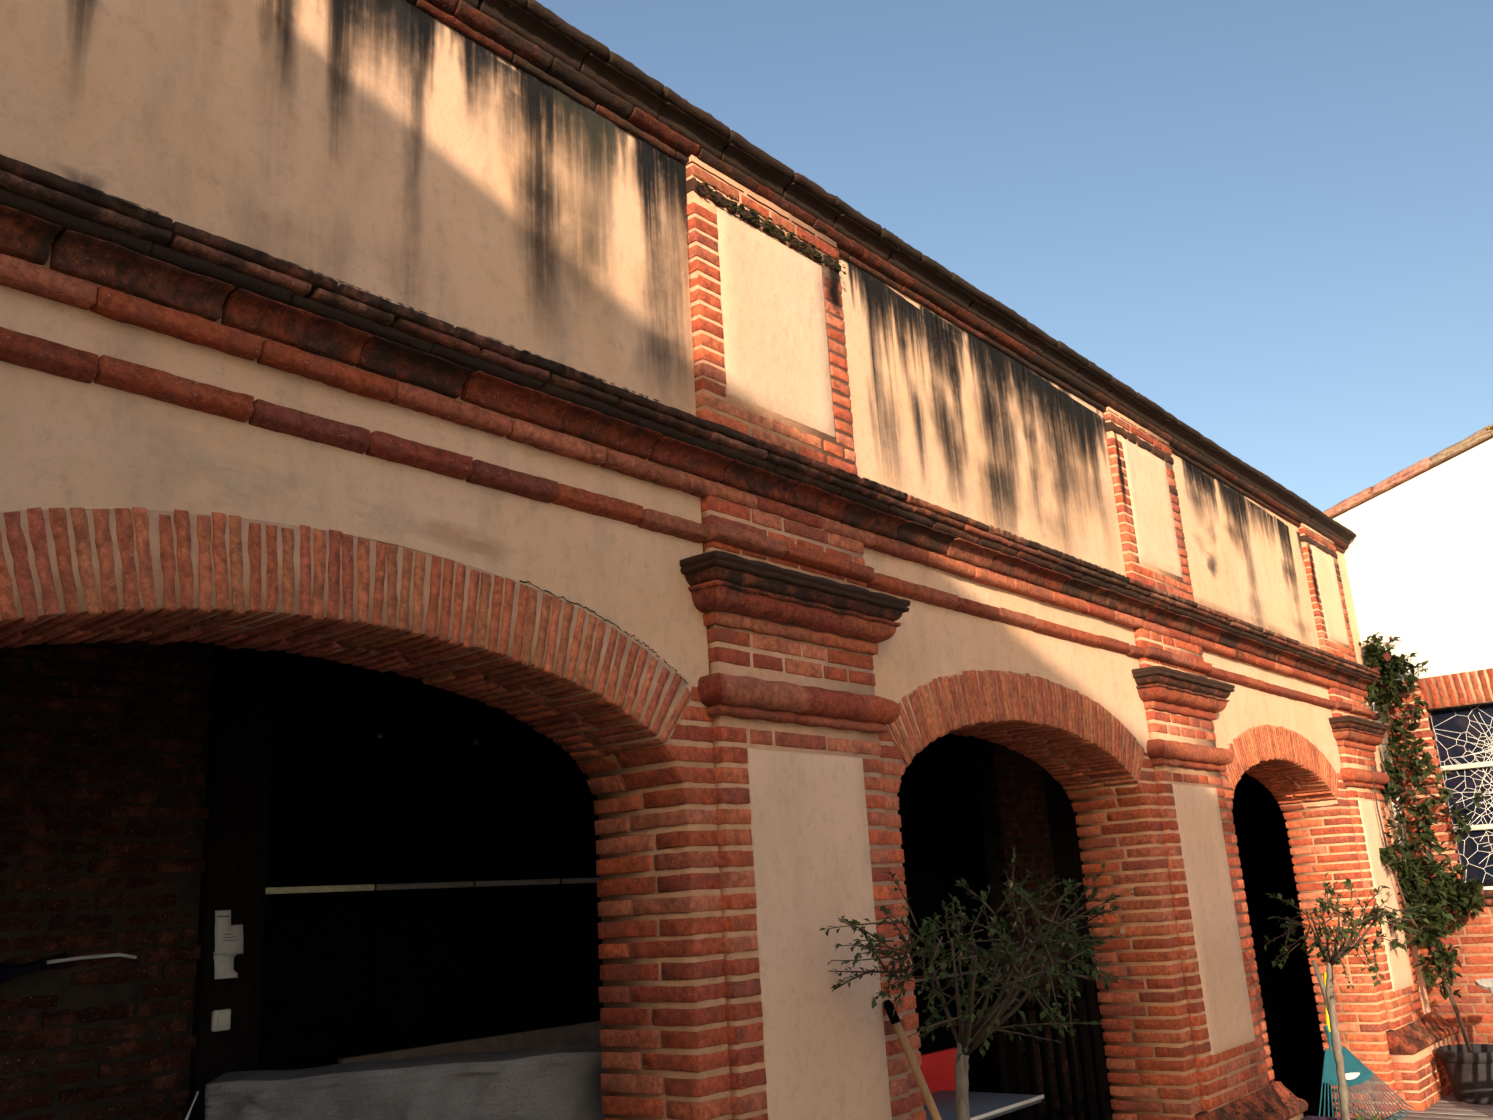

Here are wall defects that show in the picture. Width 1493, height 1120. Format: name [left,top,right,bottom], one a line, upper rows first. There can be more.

damp [334,0,687,219]
damp [829,261,1124,486]
damp [1182,459,1317,587]